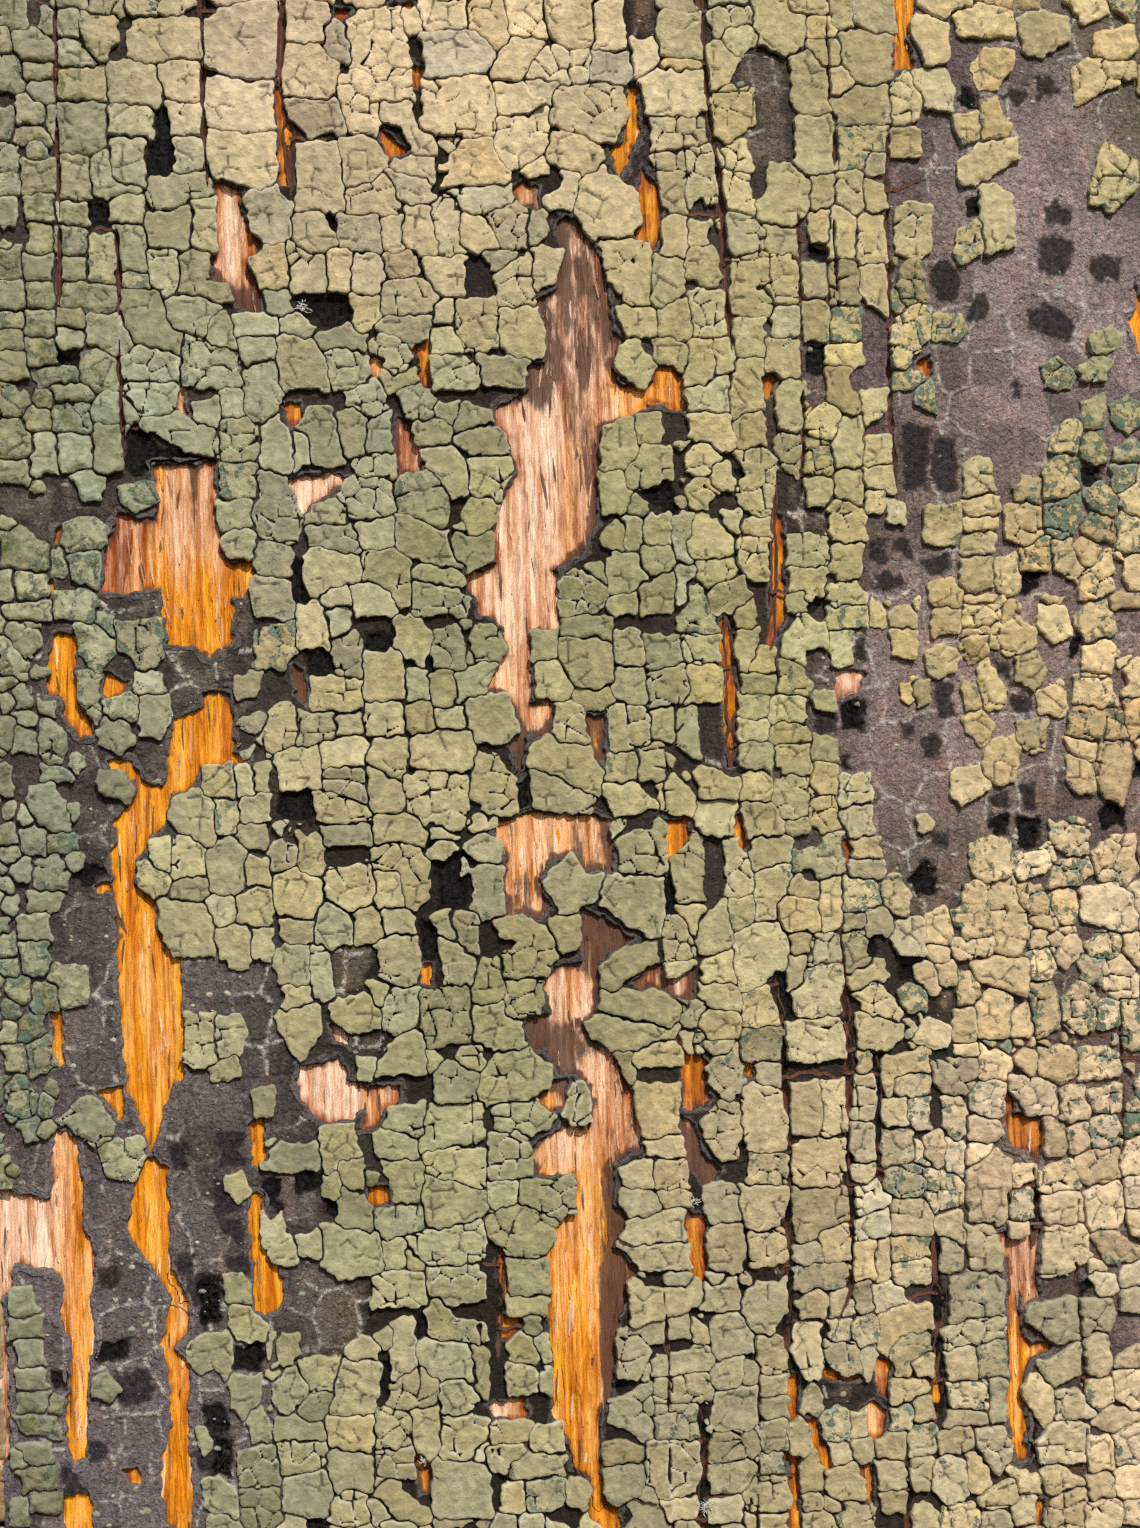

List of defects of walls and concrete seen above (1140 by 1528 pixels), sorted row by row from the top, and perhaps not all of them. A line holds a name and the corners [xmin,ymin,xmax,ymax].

crack [175,0,243,198]
crack [244,0,327,196]
peeling [493,0,708,175]
crack [19,0,156,470]
crack [688,0,930,767]
peeling [888,0,1140,698]
peeling [256,701,470,912]
peeling [850,515,1140,957]
peeling [265,1057,519,1232]
crack [628,928,973,1528]
crack [1086,999,1140,1224]
peeling [271,1298,495,1528]